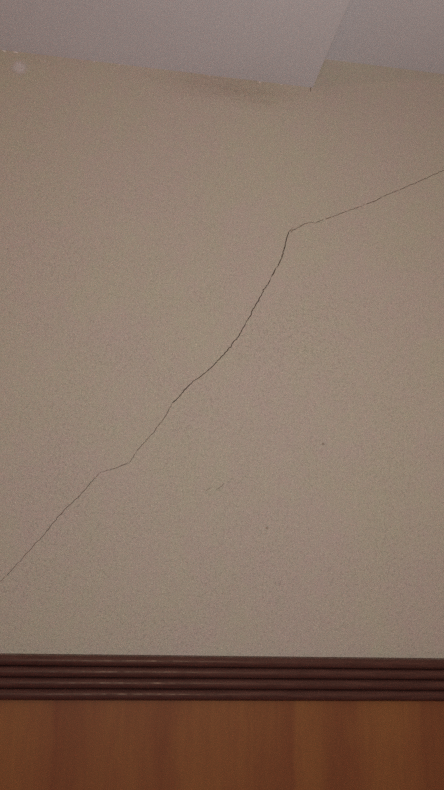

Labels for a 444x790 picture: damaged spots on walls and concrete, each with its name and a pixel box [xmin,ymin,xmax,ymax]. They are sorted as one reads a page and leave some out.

crack [1,170,444,581]